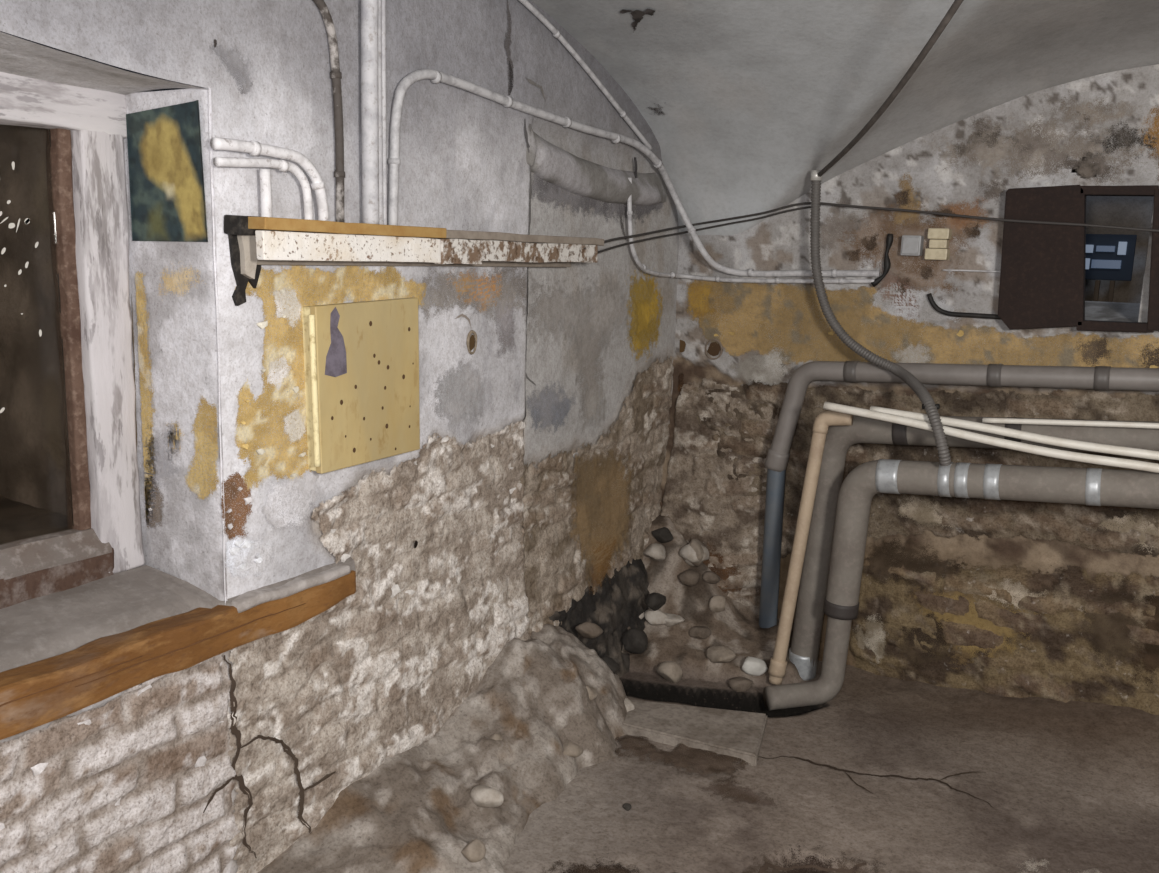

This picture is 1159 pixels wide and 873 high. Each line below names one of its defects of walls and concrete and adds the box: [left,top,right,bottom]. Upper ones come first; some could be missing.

crack [504,0,546,316]
damp [921,89,1158,204]
spalling [0,265,1159,873]
crack [203,655,336,858]
damp [542,856,641,873]
crack [758,756,992,807]